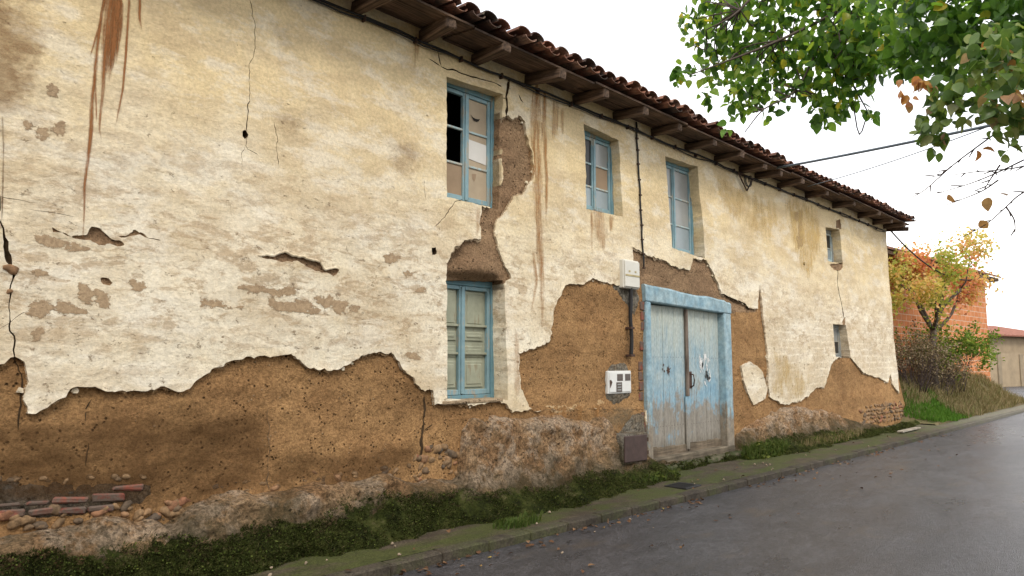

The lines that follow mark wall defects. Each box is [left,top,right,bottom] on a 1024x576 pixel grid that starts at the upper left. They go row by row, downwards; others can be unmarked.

rust [83,0,141,221]
crack [241,2,279,163]
crack [0,196,73,429]
peeling [35,227,160,252]
crack [420,397,432,455]
spalling [0,247,905,537]
spalling [446,114,533,290]